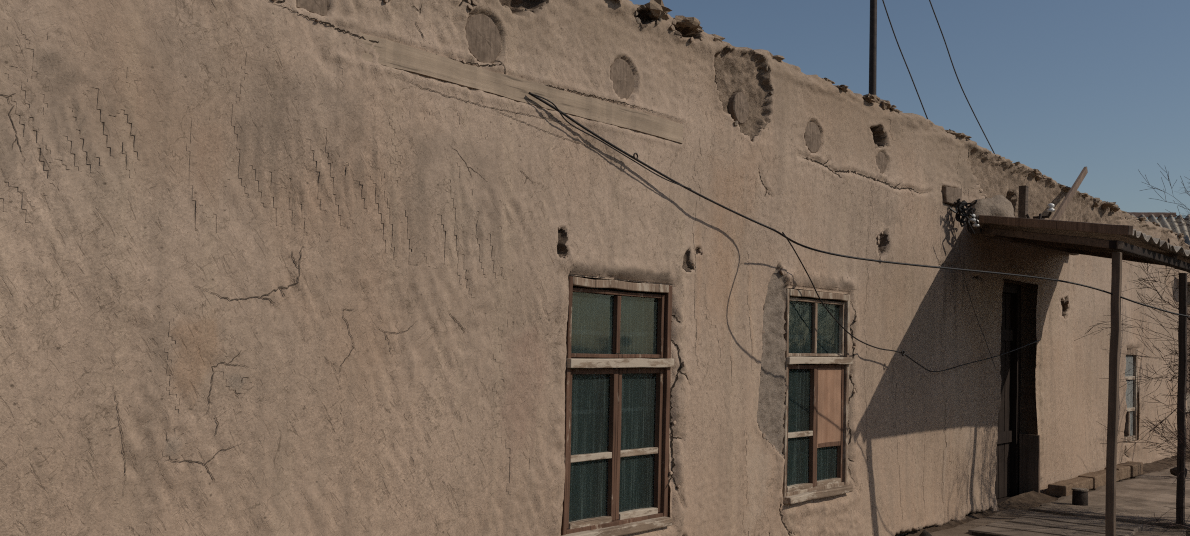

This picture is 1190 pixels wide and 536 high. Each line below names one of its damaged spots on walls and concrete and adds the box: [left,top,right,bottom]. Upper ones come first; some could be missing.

crack [268,0,379,43]
crack [383,0,506,74]
spalling [635,6,676,30]
crack [542,83,673,117]
spalling [714,46,774,142]
crack [799,155,930,194]
crack [197,240,303,307]
peeling [557,227,569,259]
crack [168,351,249,481]
crack [666,315,689,503]
flaking render [757,265,788,456]
crack [848,301,857,482]